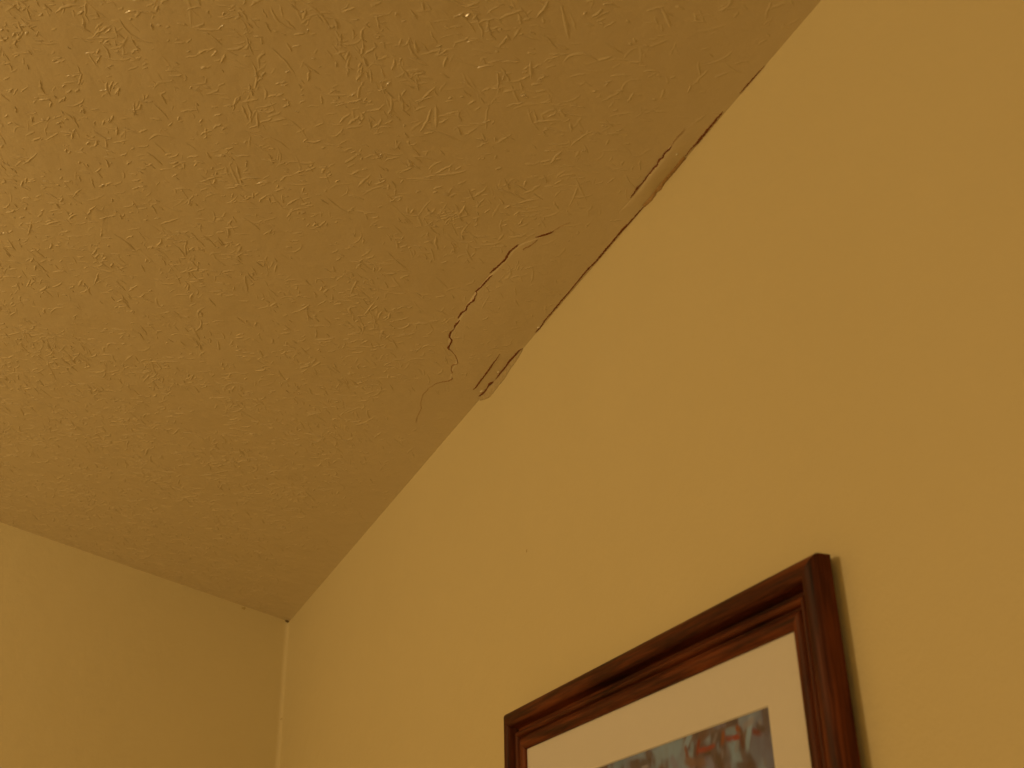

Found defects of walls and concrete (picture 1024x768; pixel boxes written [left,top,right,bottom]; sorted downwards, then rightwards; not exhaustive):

crack [416,222,570,421]
crack [536,70,761,332]